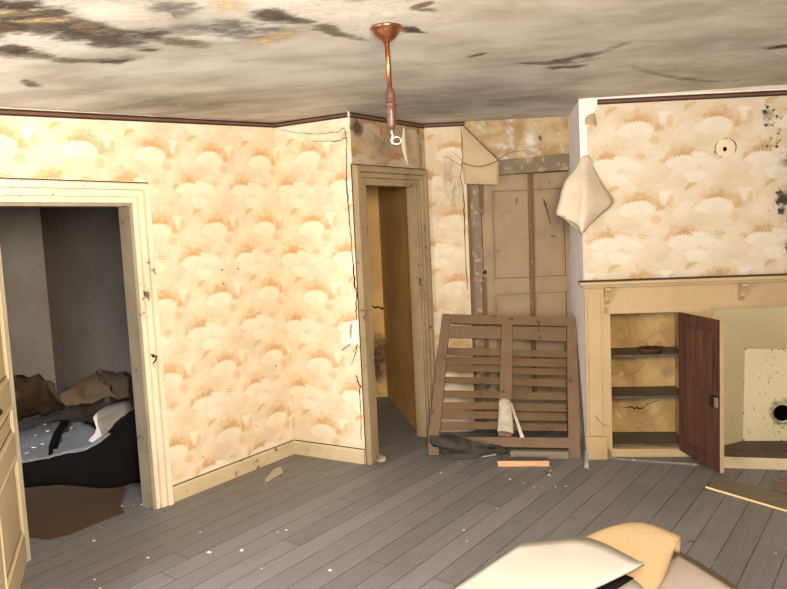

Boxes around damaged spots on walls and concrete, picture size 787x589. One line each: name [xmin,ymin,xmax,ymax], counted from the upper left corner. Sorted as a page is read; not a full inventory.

damp [0,0,359,64]
damp [518,53,598,69]
peeling [579,89,787,159]
crack [278,128,384,320]
damp [769,188,787,221]
crack [351,344,362,432]